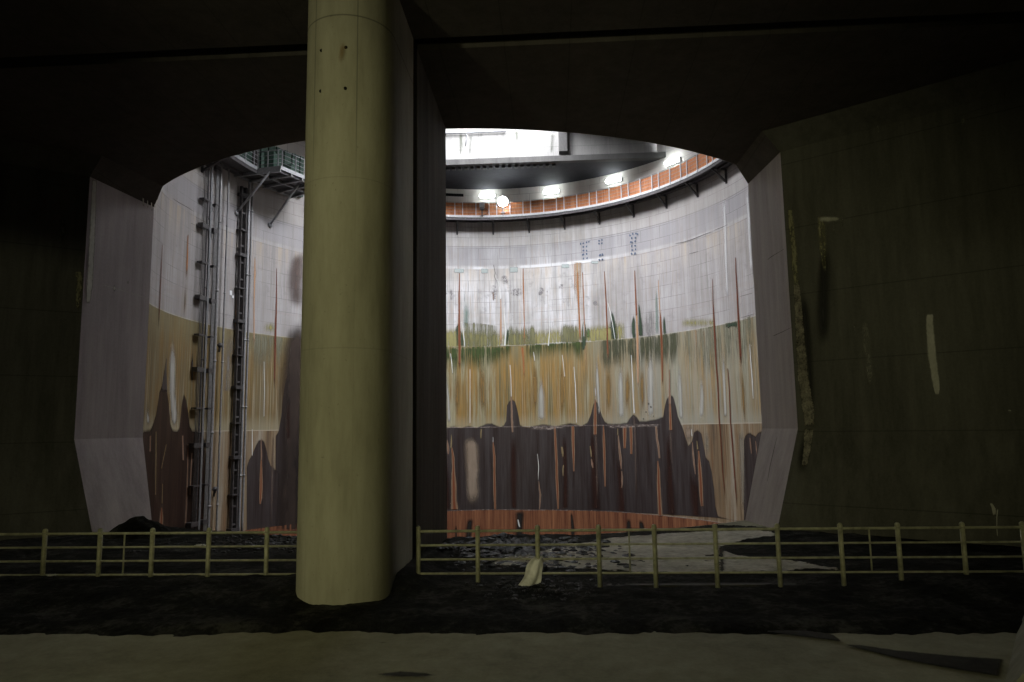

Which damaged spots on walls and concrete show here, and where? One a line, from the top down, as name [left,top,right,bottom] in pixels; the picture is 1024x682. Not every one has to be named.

water stain [143,353,205,531]
water stain [247,330,301,530]
corrosion [447,262,720,538]
water stain [447,355,724,520]
corrosion [712,279,745,502]
water stain [788,210,843,466]
water stain [926,315,940,394]